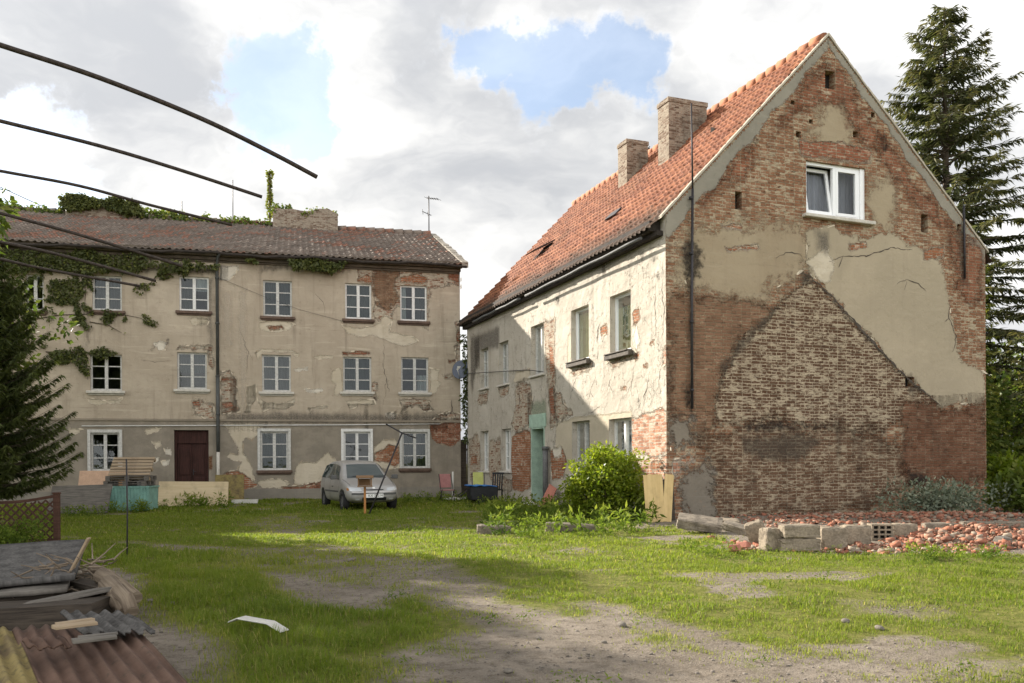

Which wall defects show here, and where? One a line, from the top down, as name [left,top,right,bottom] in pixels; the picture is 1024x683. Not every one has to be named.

spalling [342,268,462,346]
flaking render [606,61,988,517]
crack [778,252,938,403]
crack [832,247,911,266]
spalling [153,339,379,489]
spalling [374,438,400,471]
spalling [399,321,533,493]
spalling [550,446,567,480]